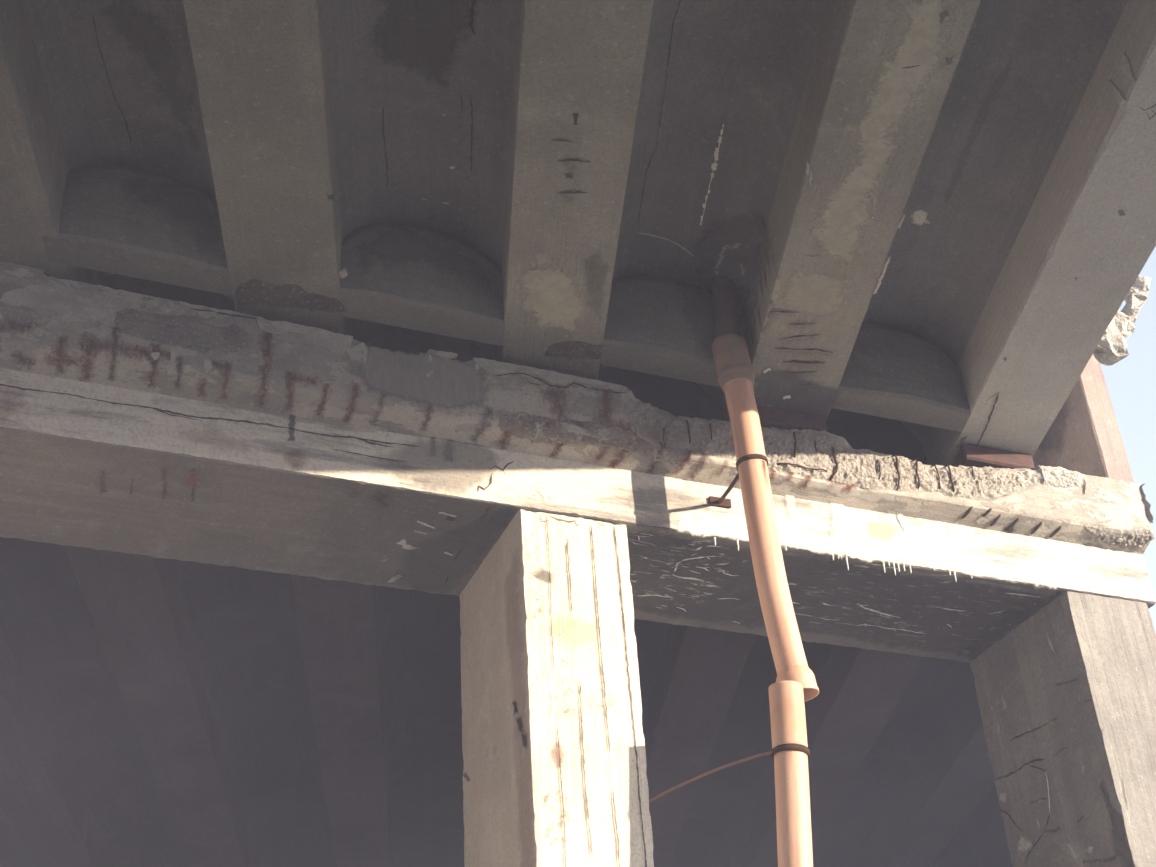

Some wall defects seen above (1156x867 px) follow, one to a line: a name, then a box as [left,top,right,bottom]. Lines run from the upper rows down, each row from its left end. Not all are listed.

damp [810,0,953,263]
damp [695,124,847,330]
corrosion [12,327,183,388]
crack [0,384,421,462]
peeling [113,309,737,462]
corrosion [595,389,635,469]
corrosion [672,449,708,480]
crack [773,311,833,385]
spalling [761,427,1081,530]
damp [628,517,766,627]
damp [778,495,1081,659]
crack [520,507,745,867]